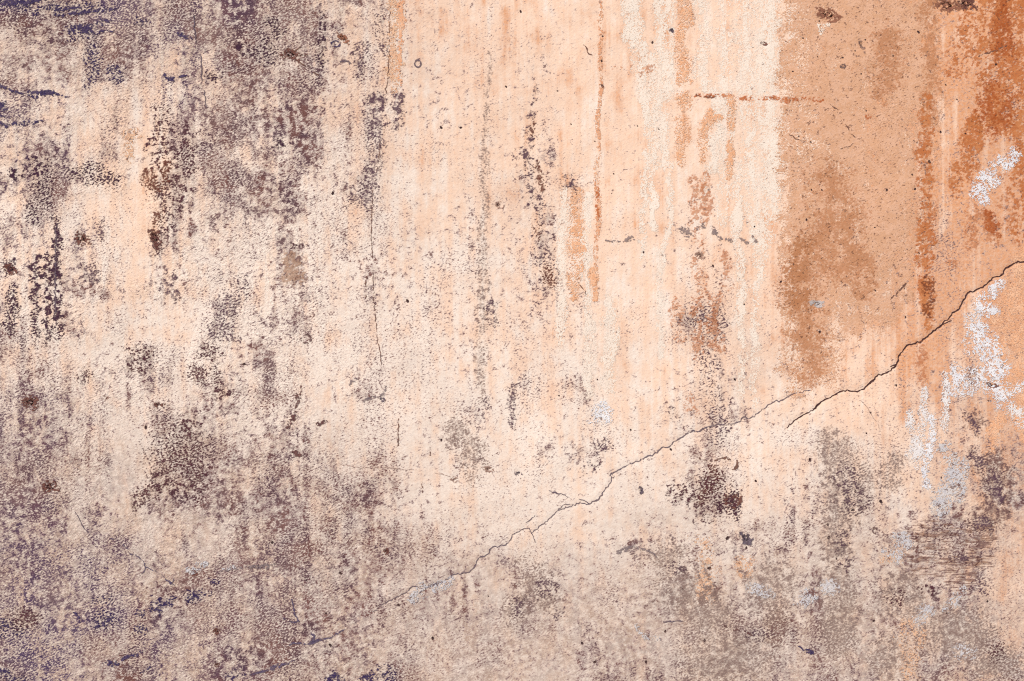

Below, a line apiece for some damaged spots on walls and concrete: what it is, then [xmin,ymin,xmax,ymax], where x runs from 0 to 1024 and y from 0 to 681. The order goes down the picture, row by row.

leakage [235,16,289,66]
leakage [0,152,65,346]
leakage [68,161,121,190]
leakage [139,104,202,257]
leakage [347,91,407,212]
corrosion [914,93,957,386]
corrosion [945,0,1024,455]
leakage [130,411,213,515]
leakage [183,273,249,400]
crack [373,261,1024,612]
leakage [665,465,742,524]
leakage [904,279,1024,531]